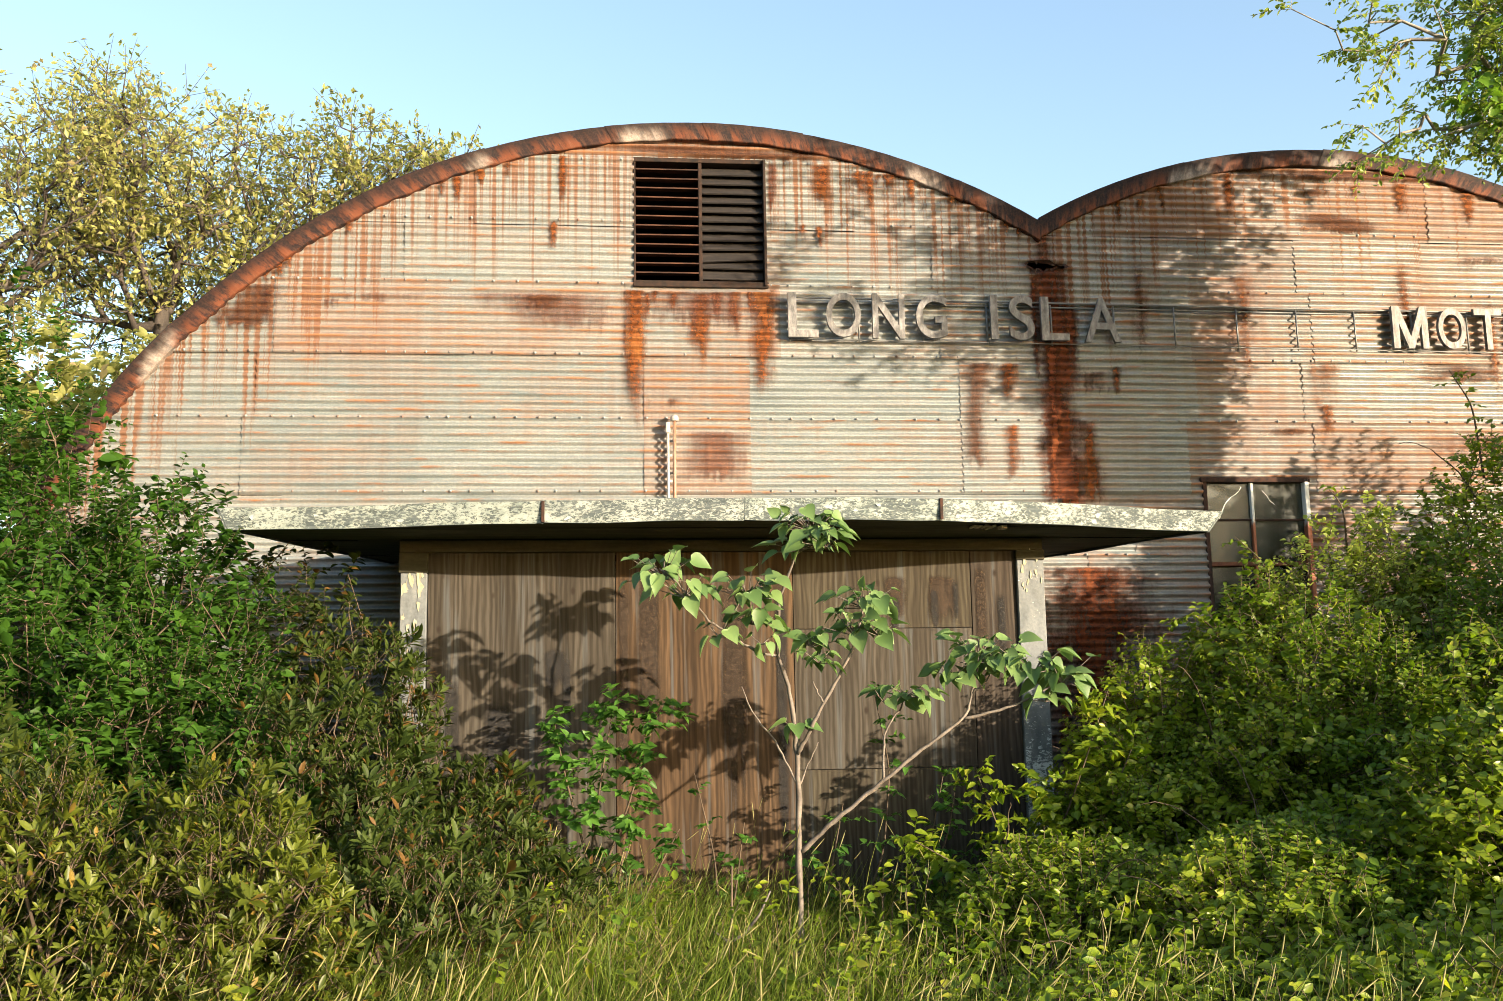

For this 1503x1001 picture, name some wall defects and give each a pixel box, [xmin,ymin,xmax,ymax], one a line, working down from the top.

rust [440,169,485,200]
rust [559,156,567,199]
rust [1253,170,1432,212]
rust [1304,214,1374,233]
rust [215,257,292,327]
rust [496,293,585,323]
rust [624,290,775,421]
rust [1030,235,1120,504]
rust [968,363,1018,466]
rust [699,432,734,479]
rust [1008,425,1018,474]
rust [1045,567,1161,790]